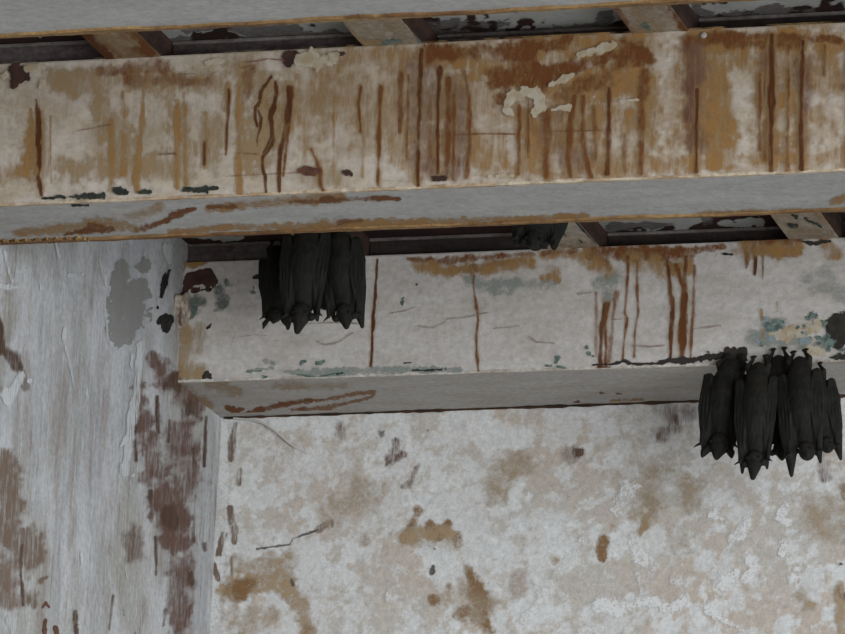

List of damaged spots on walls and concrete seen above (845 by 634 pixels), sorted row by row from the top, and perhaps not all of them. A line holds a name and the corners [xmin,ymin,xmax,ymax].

corrosion [7,5,845,237]
peeling [502,73,575,118]
peeling [41,186,152,207]
peeling [182,185,219,194]
corrosion [407,244,726,372]
peeling [585,308,845,366]
corrosion [131,324,242,634]
corrosion [399,507,461,545]
leakage [609,477,641,517]
leakage [216,554,316,634]
leakage [591,538,691,618]
leakage [703,552,762,632]